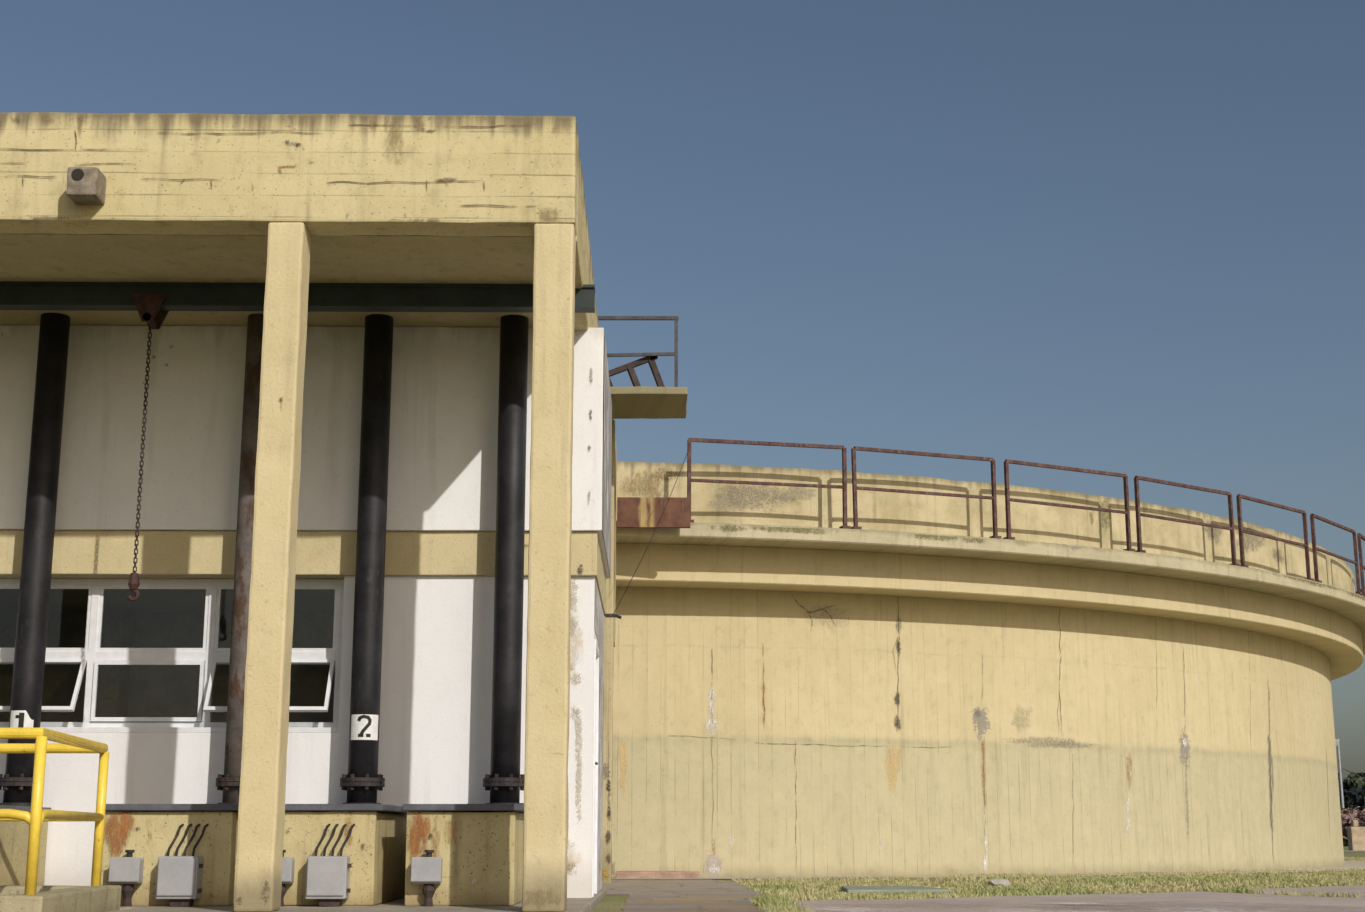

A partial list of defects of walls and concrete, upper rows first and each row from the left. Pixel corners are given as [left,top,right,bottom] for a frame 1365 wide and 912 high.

crack [894,610,933,748]
rust [105,812,140,855]
rust [411,812,454,856]
leakage [603,754,615,874]